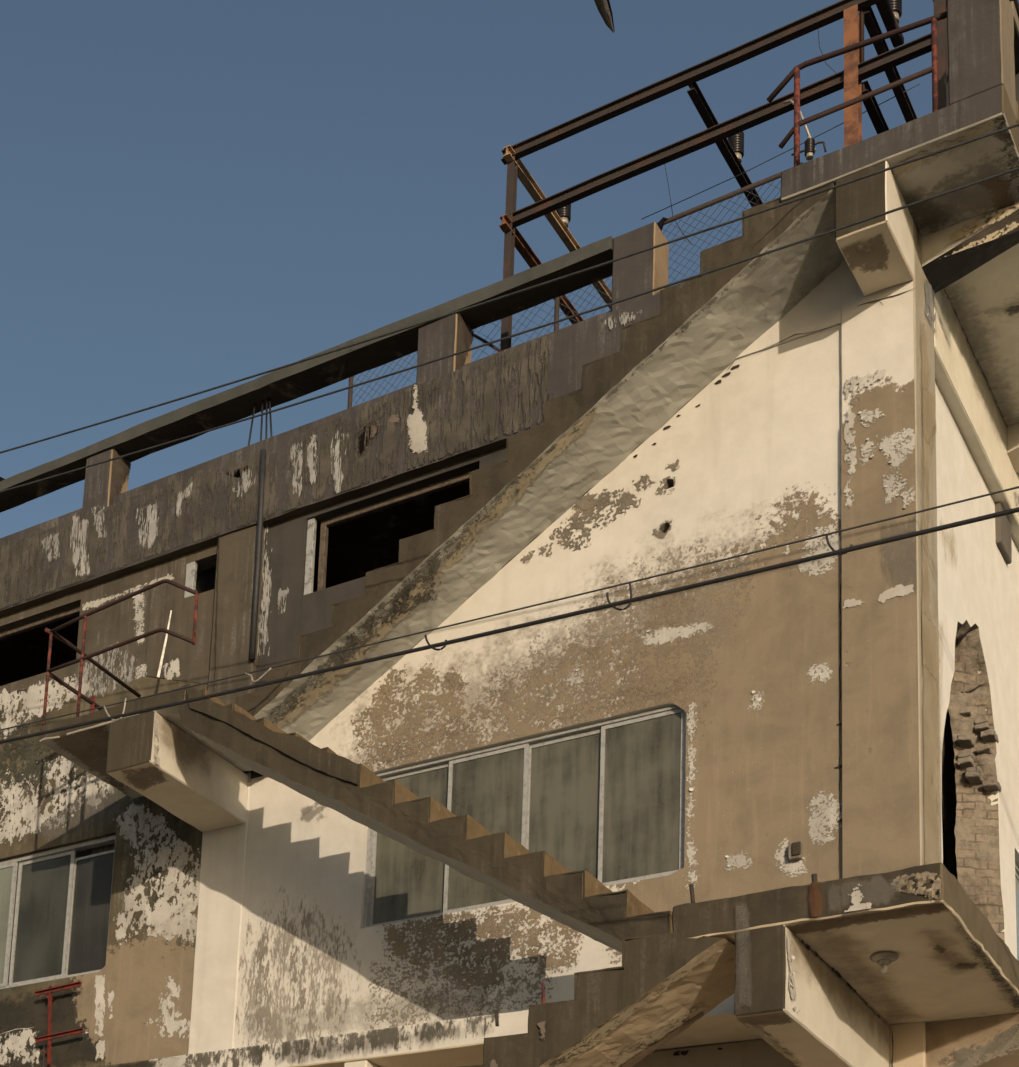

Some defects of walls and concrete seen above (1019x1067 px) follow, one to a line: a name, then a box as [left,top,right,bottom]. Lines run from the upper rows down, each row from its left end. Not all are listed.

spalling [248,397,272,446]
peeling [351,370,942,912]
water stain [0,978,106,1067]
peeling [69,928,195,1065]
water stain [117,902,495,1067]
peeling [364,904,582,1029]
peeling [546,945,723,1067]
water stain [787,903,948,934]
water stain [956,938,1019,1008]